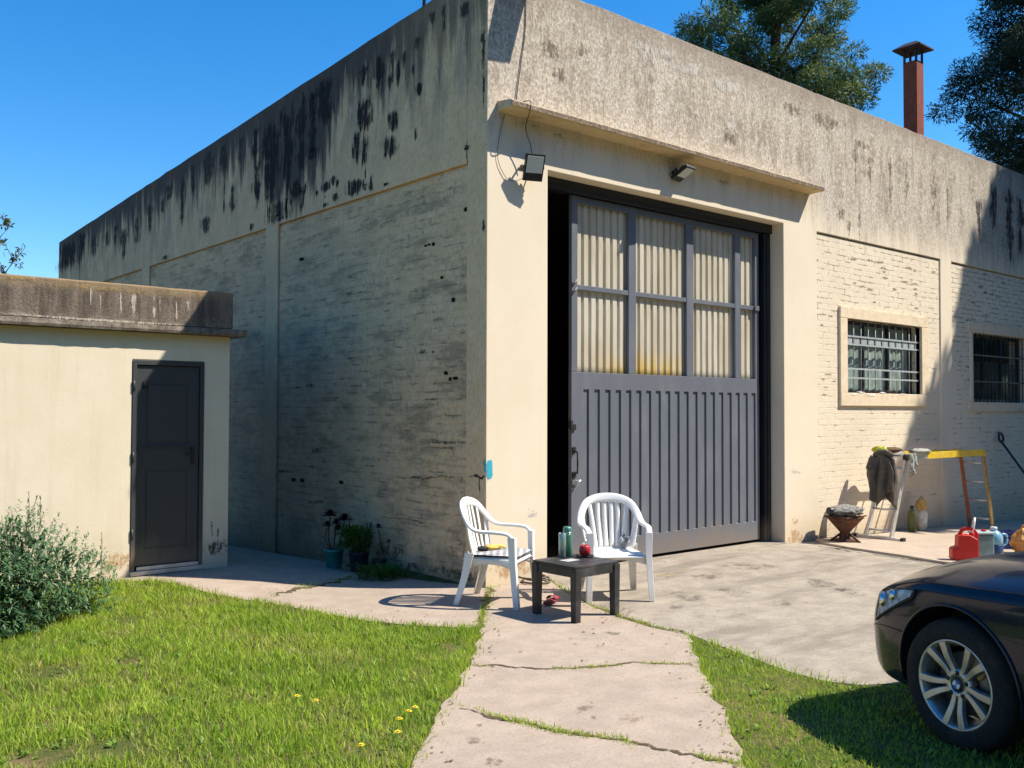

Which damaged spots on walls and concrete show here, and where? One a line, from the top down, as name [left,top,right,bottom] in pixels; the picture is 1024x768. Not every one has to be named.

leakage [55,147,235,271]
leakage [239,79,334,231]
leakage [348,37,421,197]
leakage [811,109,873,191]
leakage [976,185,1024,266]